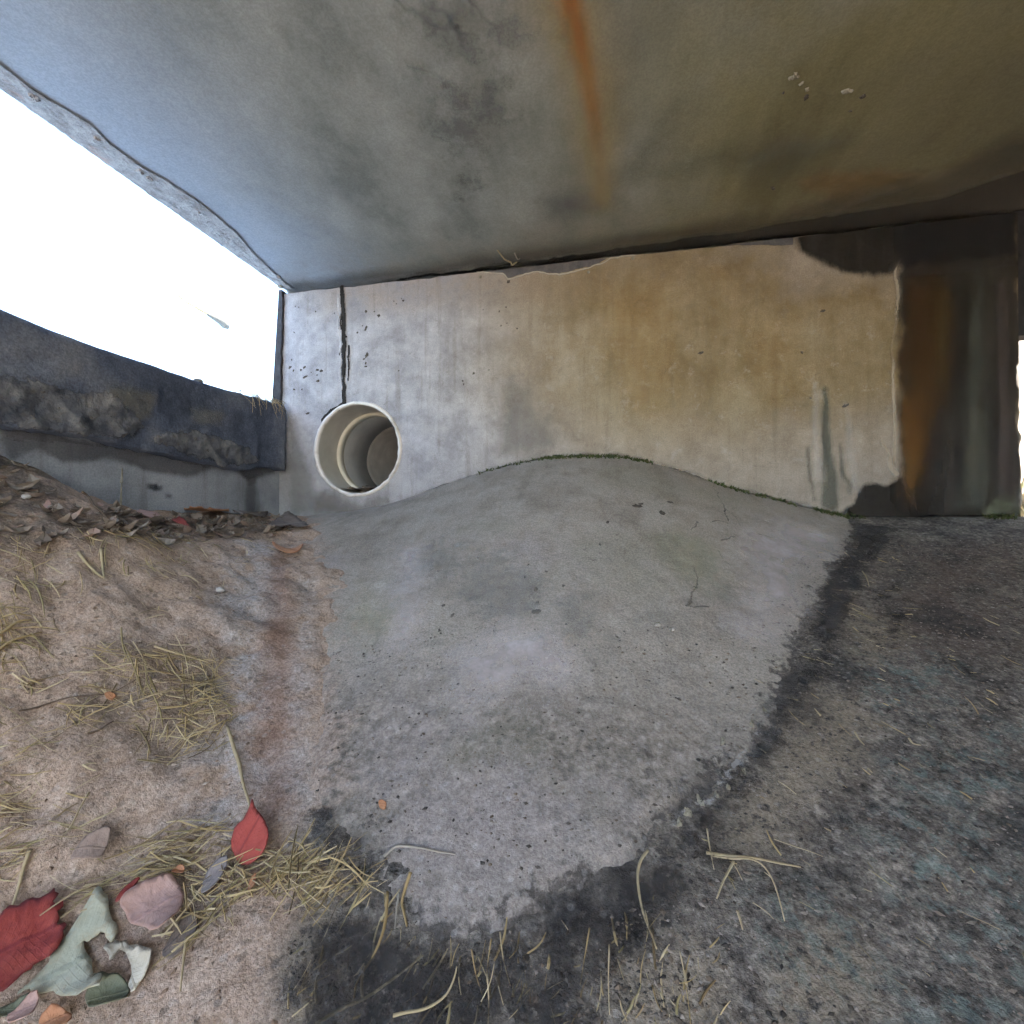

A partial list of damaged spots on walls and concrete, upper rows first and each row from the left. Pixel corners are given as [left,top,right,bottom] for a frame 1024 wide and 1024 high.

crack [321,285,350,421]
damp [281,171,1024,1024]